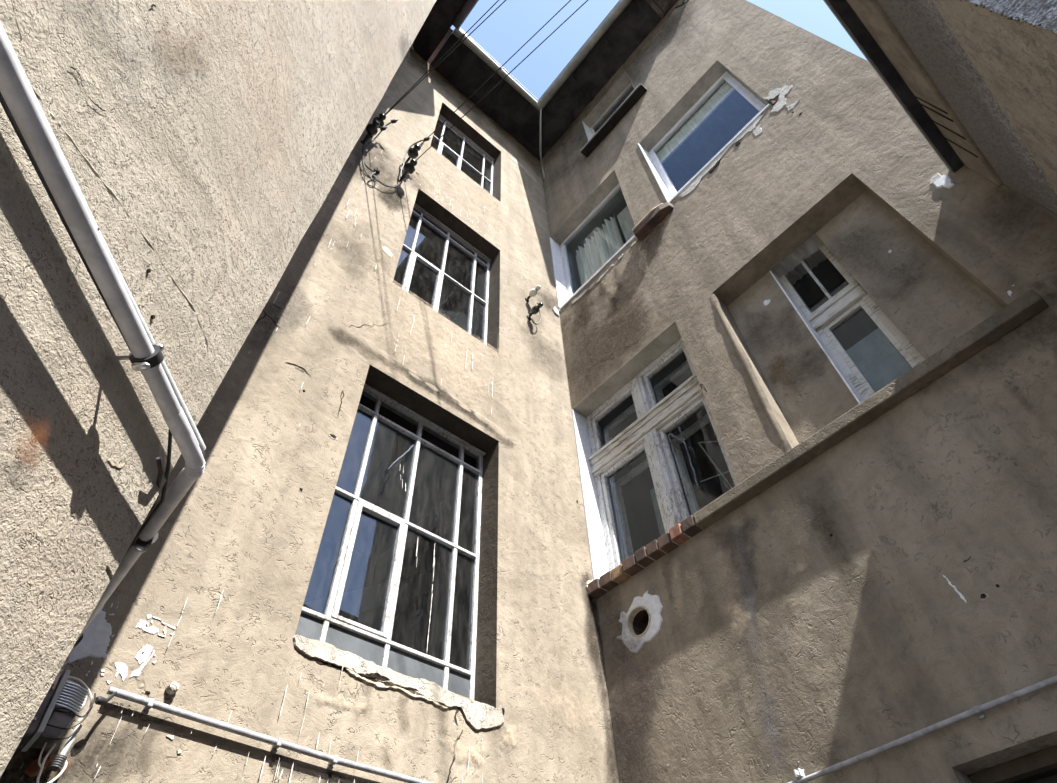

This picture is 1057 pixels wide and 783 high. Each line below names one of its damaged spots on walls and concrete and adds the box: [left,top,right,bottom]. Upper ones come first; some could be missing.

flaking render [678,85,802,197]
peeling [130,650,157,678]
peeling [146,615,176,637]
crack [316,660,347,671]
flaking render [292,634,505,731]
water stain [582,573,660,783]
water stain [260,753,294,783]
crack [397,685,462,783]